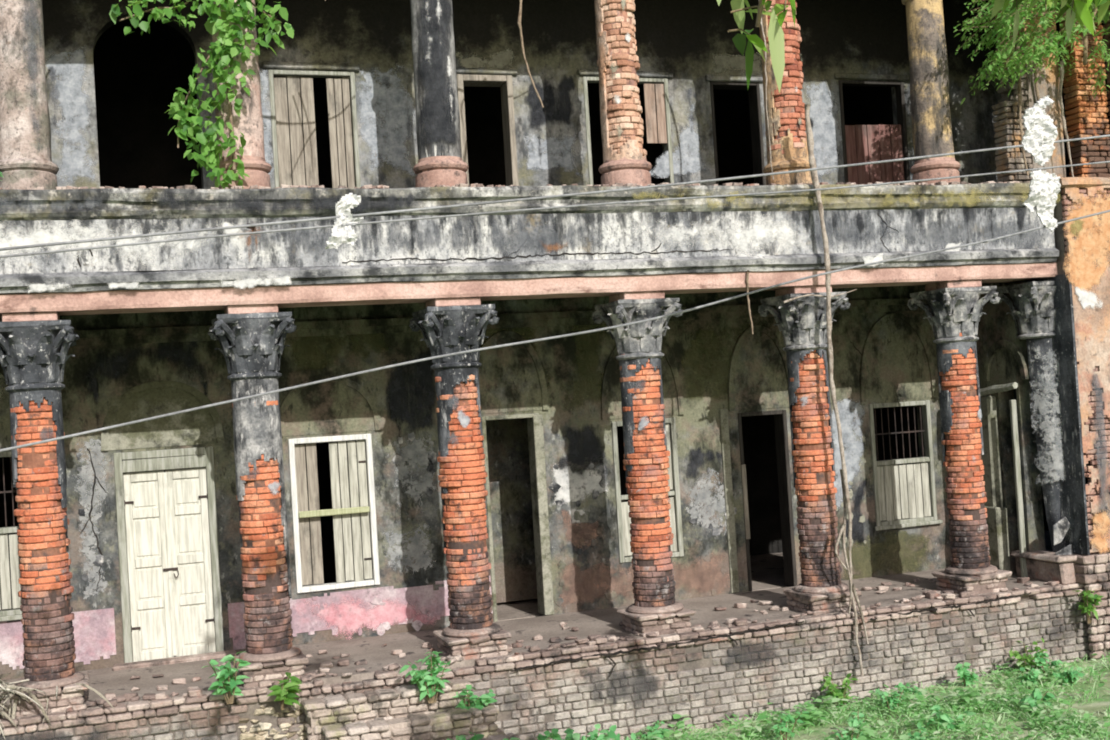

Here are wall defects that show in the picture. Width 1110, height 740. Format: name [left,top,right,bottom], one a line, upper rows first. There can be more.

damp [418,0,456,145]
damp [525,75,574,129]
spalling [527,0,1020,187]
damp [352,194,599,256]
spalling [10,397,108,600]
damp [386,348,436,437]
spalling [384,375,491,586]
damp [558,425,605,475]
spalling [548,354,737,606]
spalling [790,349,868,511]
damp [842,479,867,547]
spalling [939,333,988,525]